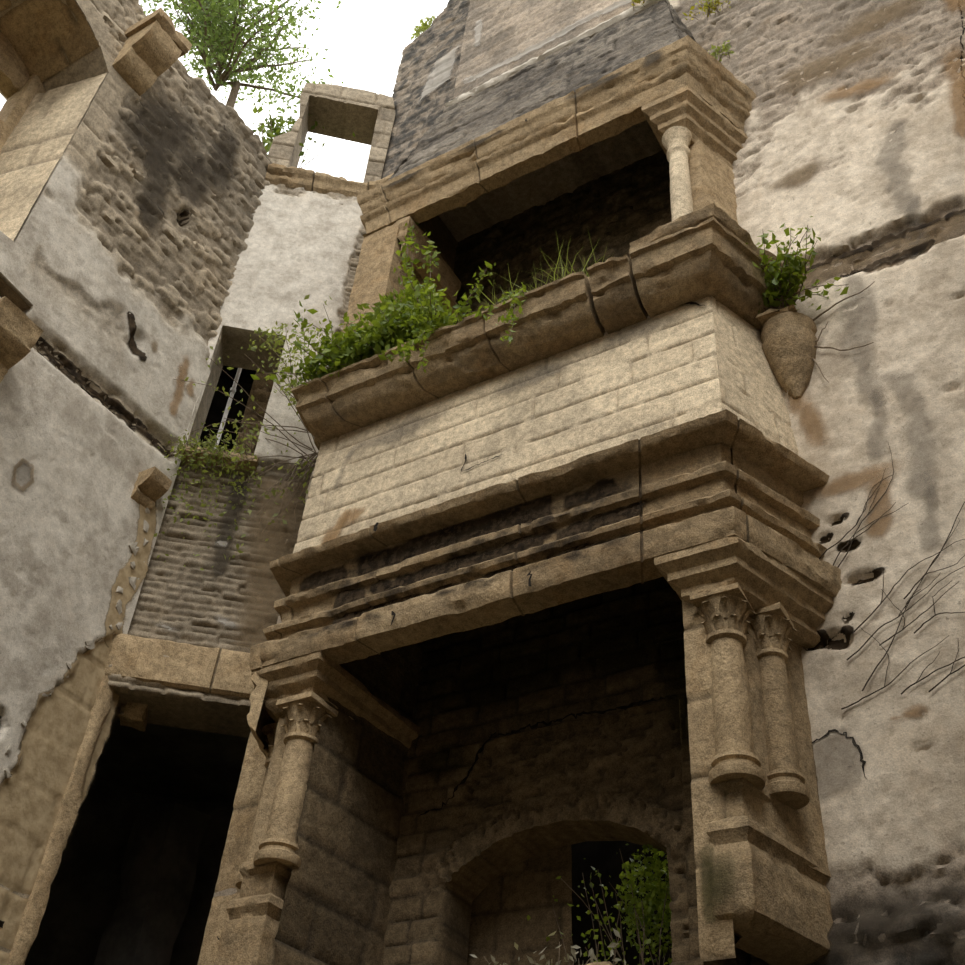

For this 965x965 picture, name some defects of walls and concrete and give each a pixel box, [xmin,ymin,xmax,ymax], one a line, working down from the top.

crack [957,0,965,70]
spalling [819,512,861,552]
spalling [850,567,885,585]
spalling [805,612,855,651]
peeling [0,497,165,965]
crack [420,696,670,815]